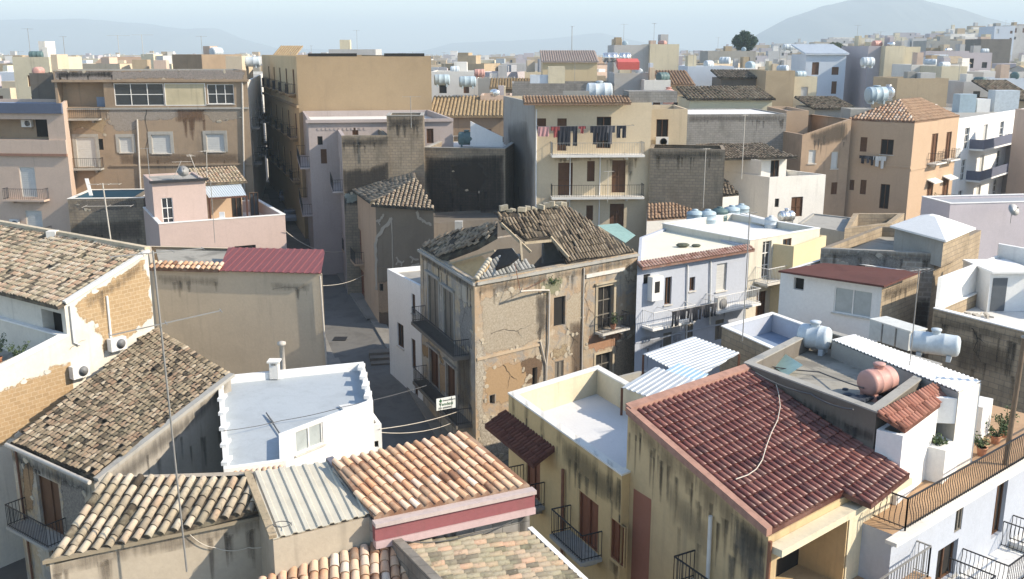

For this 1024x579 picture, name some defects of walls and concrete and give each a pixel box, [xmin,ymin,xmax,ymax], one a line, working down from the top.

flaking render [76,260,153,353]
flaking render [0,362,74,446]
flaking render [459,278,635,457]